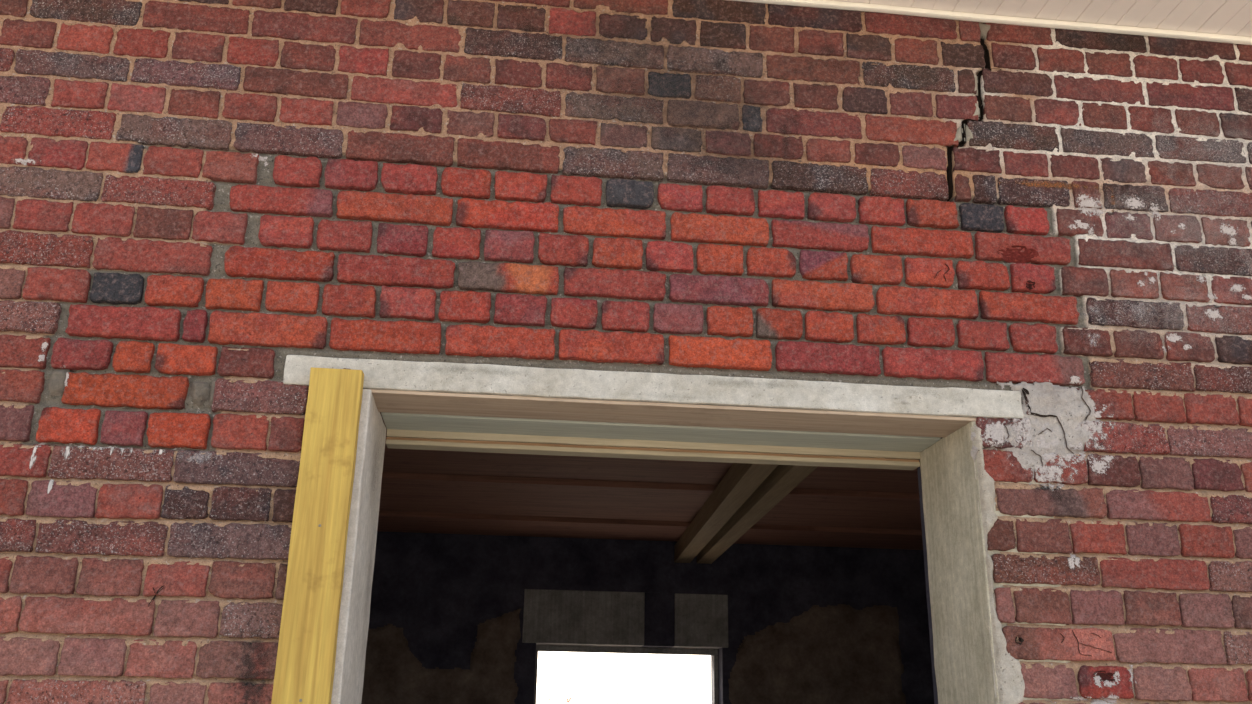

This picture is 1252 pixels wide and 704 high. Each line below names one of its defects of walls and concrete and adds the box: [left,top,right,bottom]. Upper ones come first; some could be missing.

crack [944,39,1001,201]
damp [1069,194,1105,237]
damp [1122,195,1162,220]
damp [1220,223,1238,246]
damp [1196,275,1223,321]
damp [1230,284,1252,300]
damp [1162,333,1192,353]
spalling [970,381,1096,474]
spalling [1093,671,1115,681]